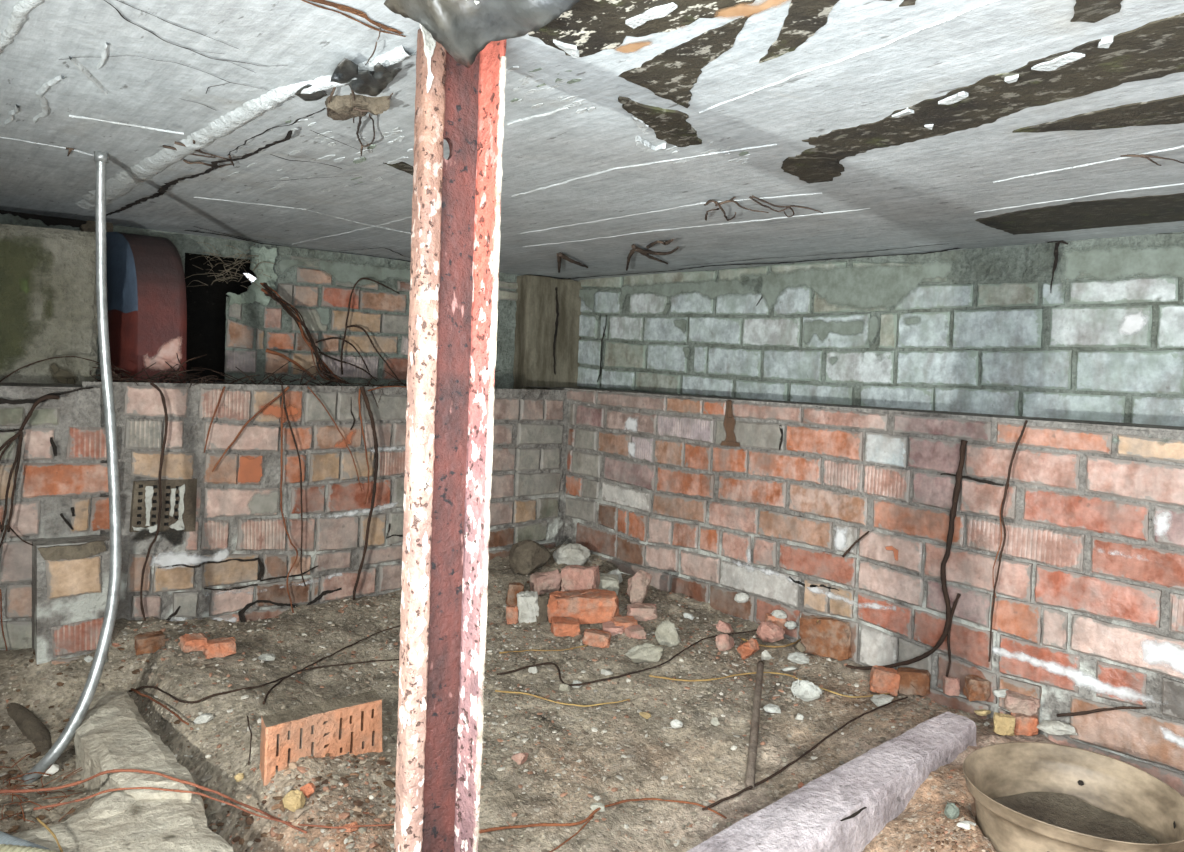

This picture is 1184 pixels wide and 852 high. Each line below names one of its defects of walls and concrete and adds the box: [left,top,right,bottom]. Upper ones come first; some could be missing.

peeling [759,0,839,63]
peeling [1070,0,1122,23]
peeling [781,13,1184,184]
peeling [489,0,755,371]
peeling [975,193,1184,235]
spalling [480,389,494,684]
efflorescence [1143,641,1184,674]
spalling [476,701,484,789]